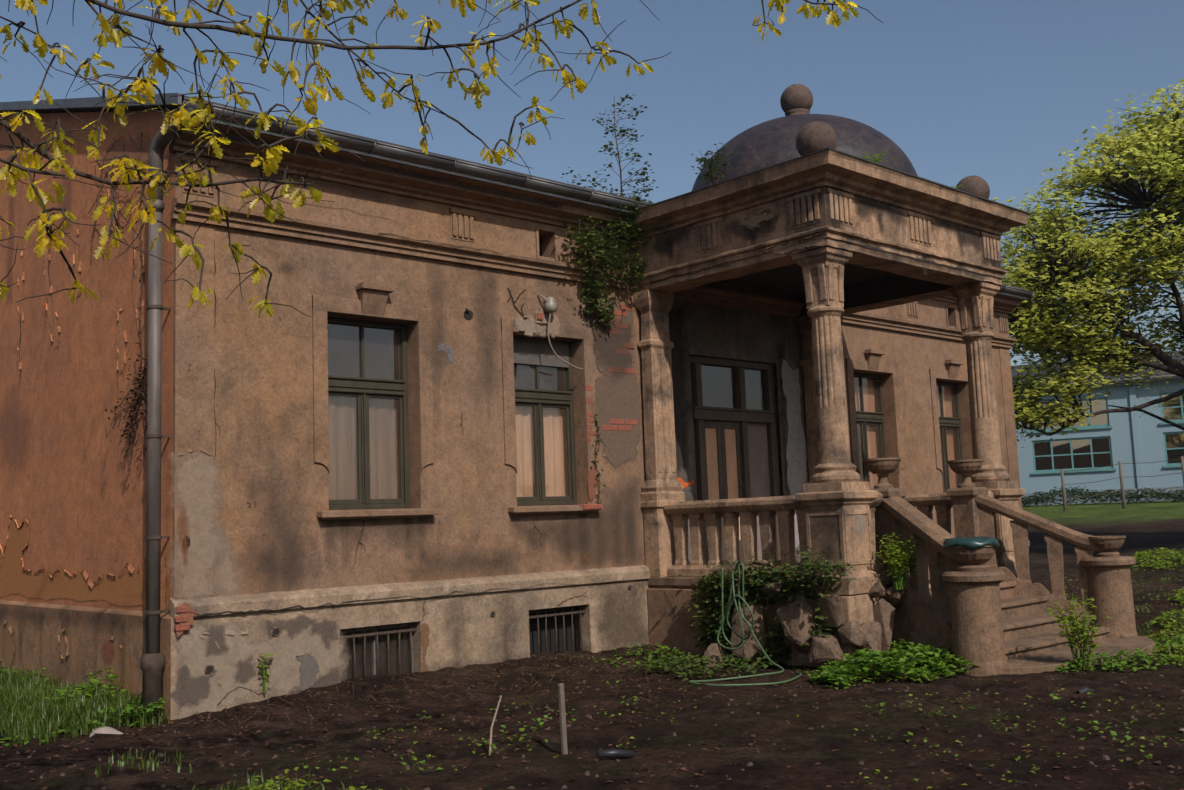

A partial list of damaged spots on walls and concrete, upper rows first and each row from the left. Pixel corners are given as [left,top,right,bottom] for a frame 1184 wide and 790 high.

flaking render [781,358,808,496]
flaking render [0,514,146,608]
spalling [171,448,345,719]